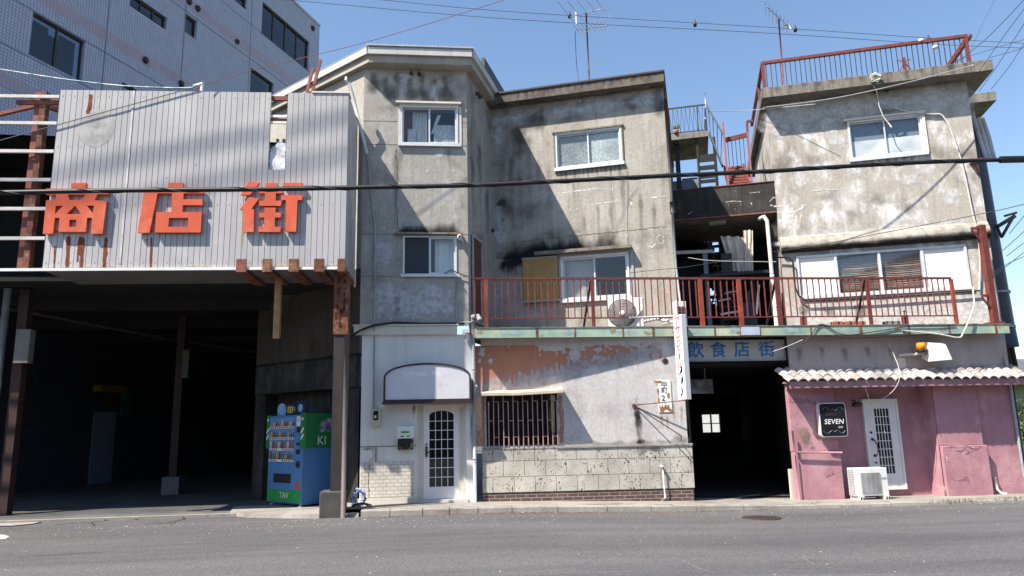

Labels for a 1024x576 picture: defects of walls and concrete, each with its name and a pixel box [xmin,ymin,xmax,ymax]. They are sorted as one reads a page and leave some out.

damp [369,74,457,101]
rust [53,236,84,268]
damp [495,214,615,269]
peeling [475,343,662,447]